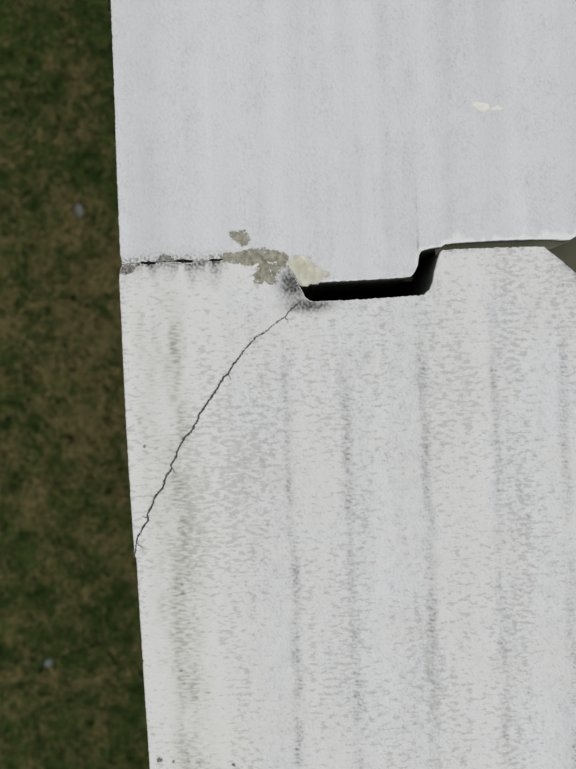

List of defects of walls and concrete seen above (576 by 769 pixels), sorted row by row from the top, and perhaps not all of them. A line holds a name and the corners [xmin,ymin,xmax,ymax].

spalling [222,230,329,287]
crack [134,300,302,556]